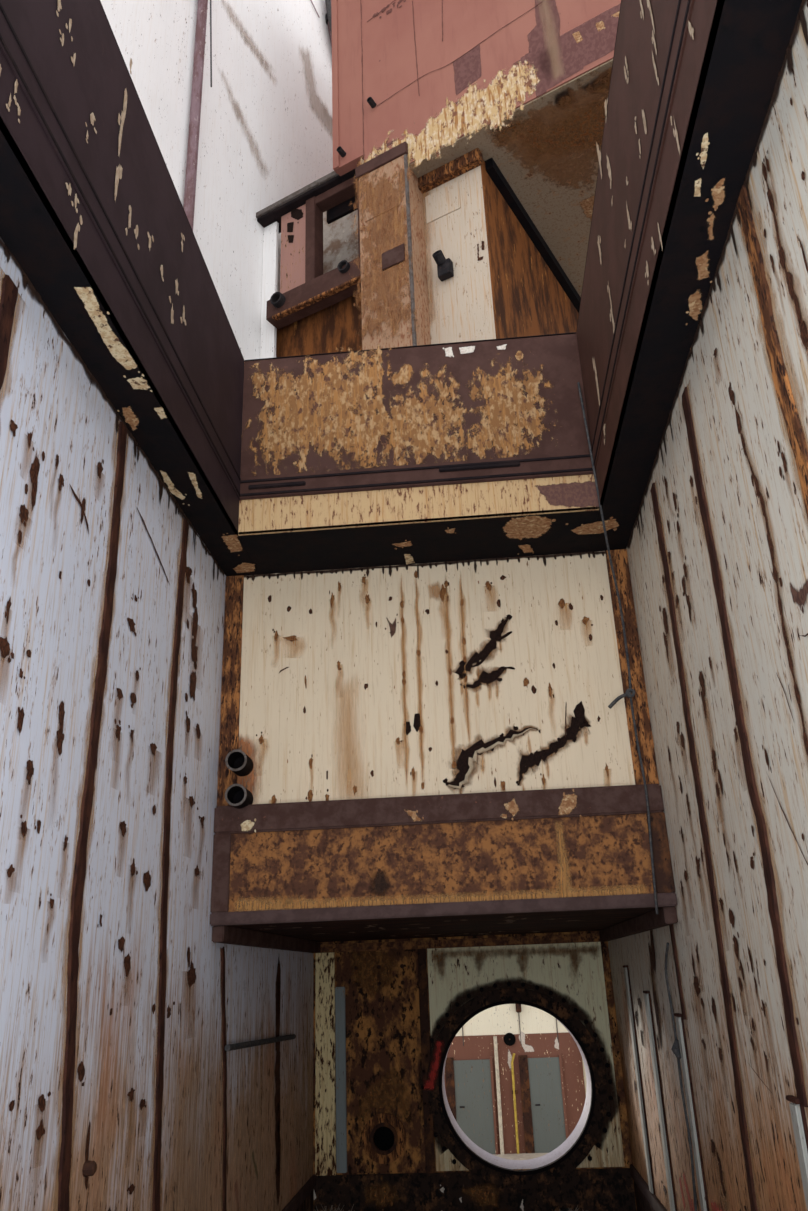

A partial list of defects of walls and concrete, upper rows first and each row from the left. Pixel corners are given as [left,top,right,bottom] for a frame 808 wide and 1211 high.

peeling [66,183,83,249]
peeling [74,287,152,392]
peeling [115,89,154,250]
peeling [160,265,186,325]
peeling [246,61,557,475]
rust [491,0,621,221]
rust [10,419,89,556]
peeling [502,516,619,554]
rust [0,597,31,679]
rust [17,707,25,735]
rust [36,420,141,1211]
rust [127,518,205,1211]